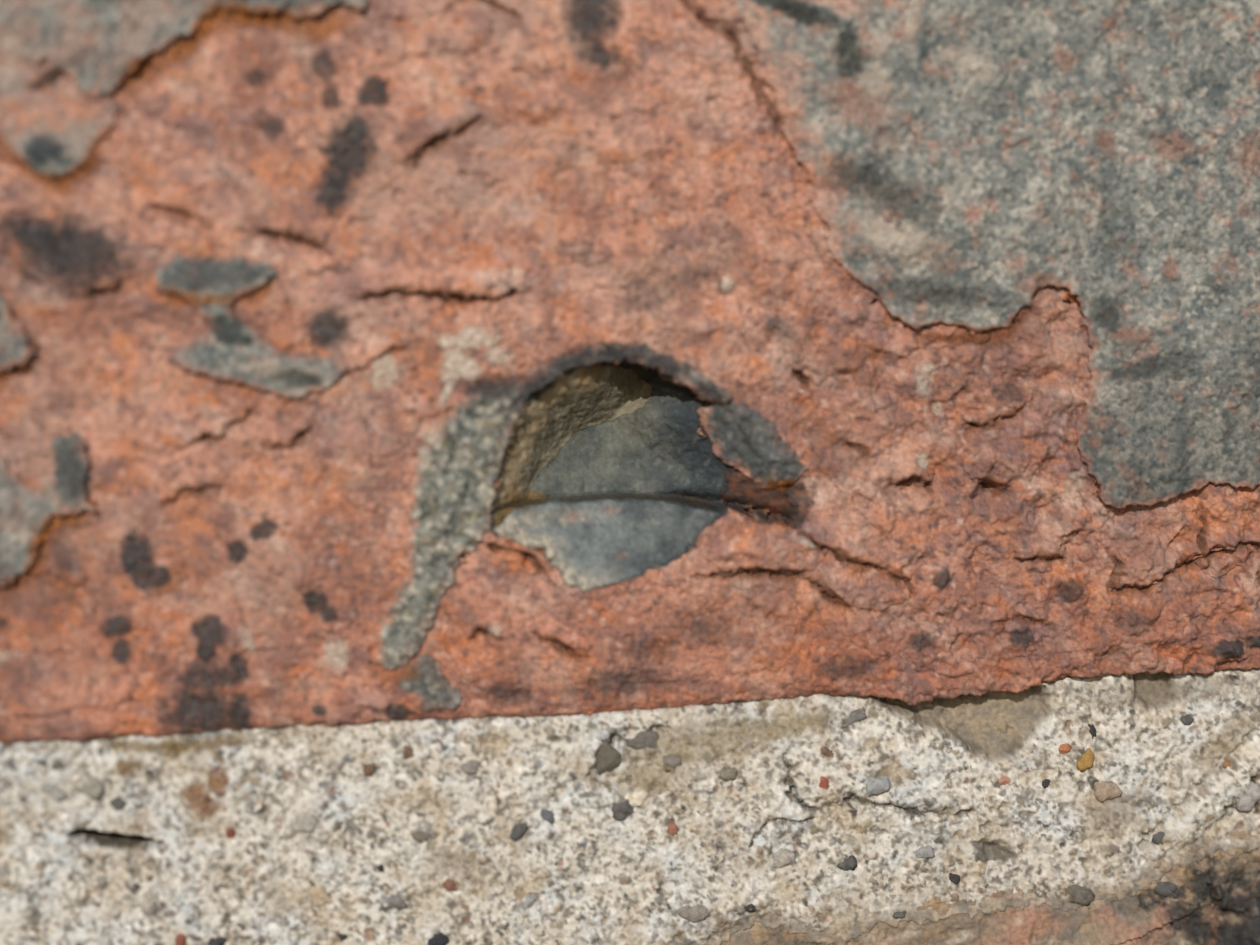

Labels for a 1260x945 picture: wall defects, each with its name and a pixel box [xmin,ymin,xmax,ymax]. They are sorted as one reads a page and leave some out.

spalling [0,0,1260,712]